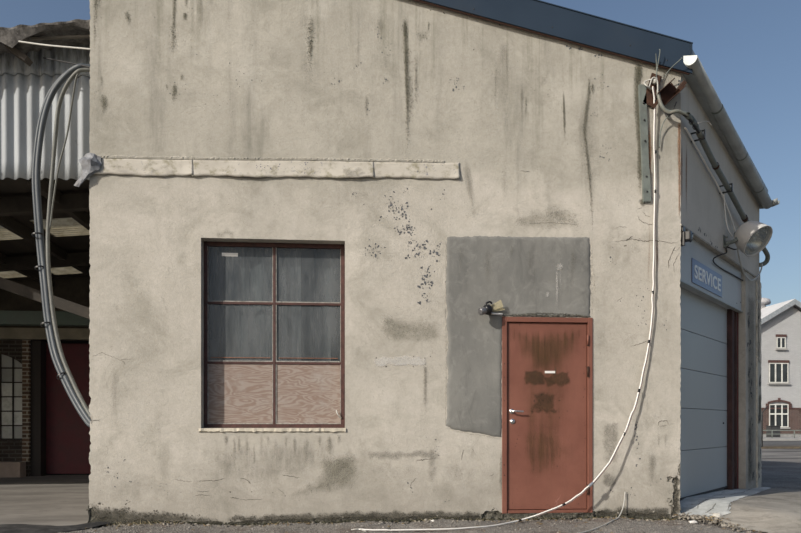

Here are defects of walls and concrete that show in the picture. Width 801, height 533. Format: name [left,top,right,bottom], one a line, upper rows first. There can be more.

leakage [402,23,418,132]
leakage [583,84,594,206]
crack [615,208,678,266]
flaking render [379,188,519,447]
rust [525,371,569,412]
flaking render [593,464,681,519]